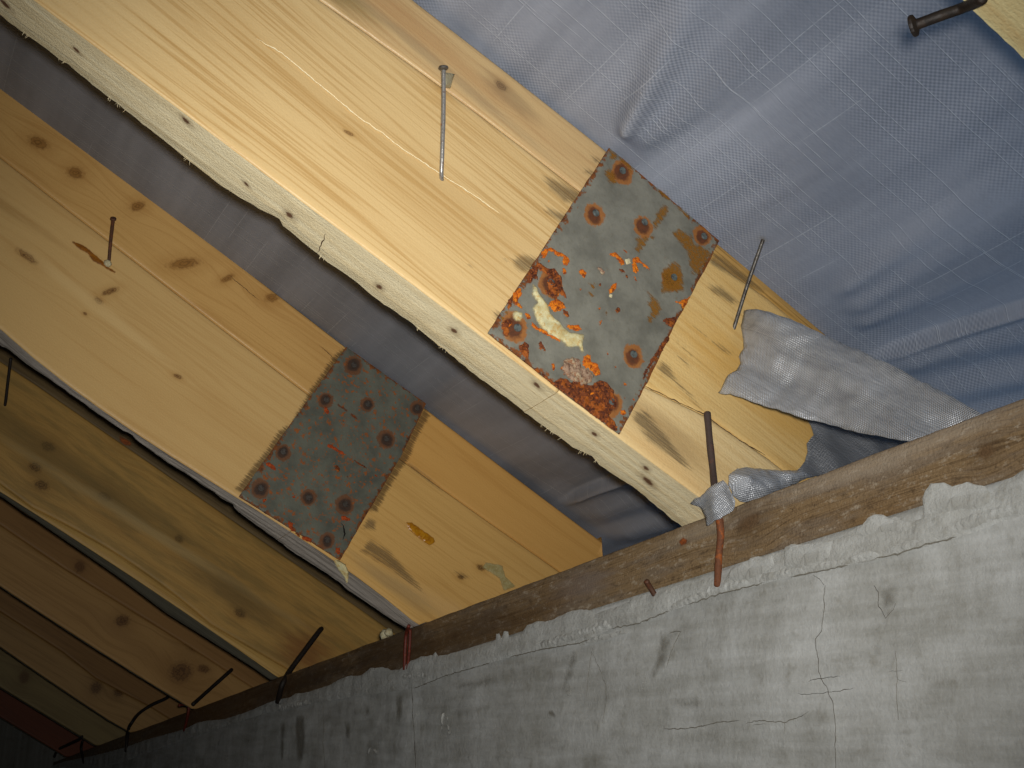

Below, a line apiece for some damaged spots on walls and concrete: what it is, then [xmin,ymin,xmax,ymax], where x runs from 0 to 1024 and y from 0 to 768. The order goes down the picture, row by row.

corrosion [501,247,635,431]
corrosion [579,191,688,324]
corrosion [643,229,710,379]
crack [875,537,954,559]
crack [411,639,606,768]
crack [613,583,761,667]
crack [666,565,848,768]